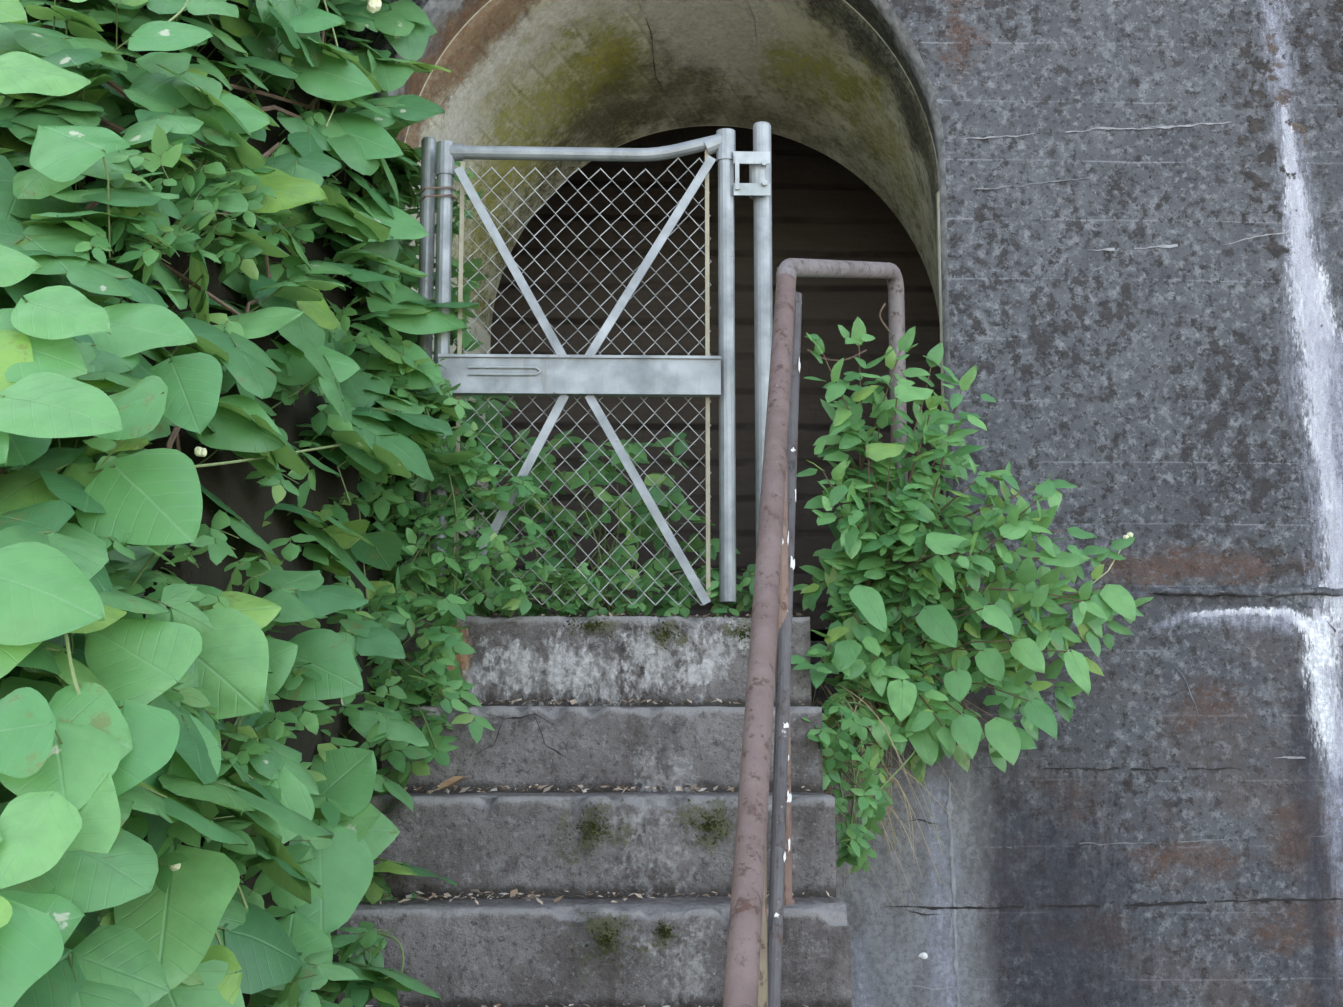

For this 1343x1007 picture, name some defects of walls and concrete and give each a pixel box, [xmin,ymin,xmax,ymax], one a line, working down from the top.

leakage [455,28,644,328]
leakage [1164,5,1343,988]
crack [885,777,1343,1007]